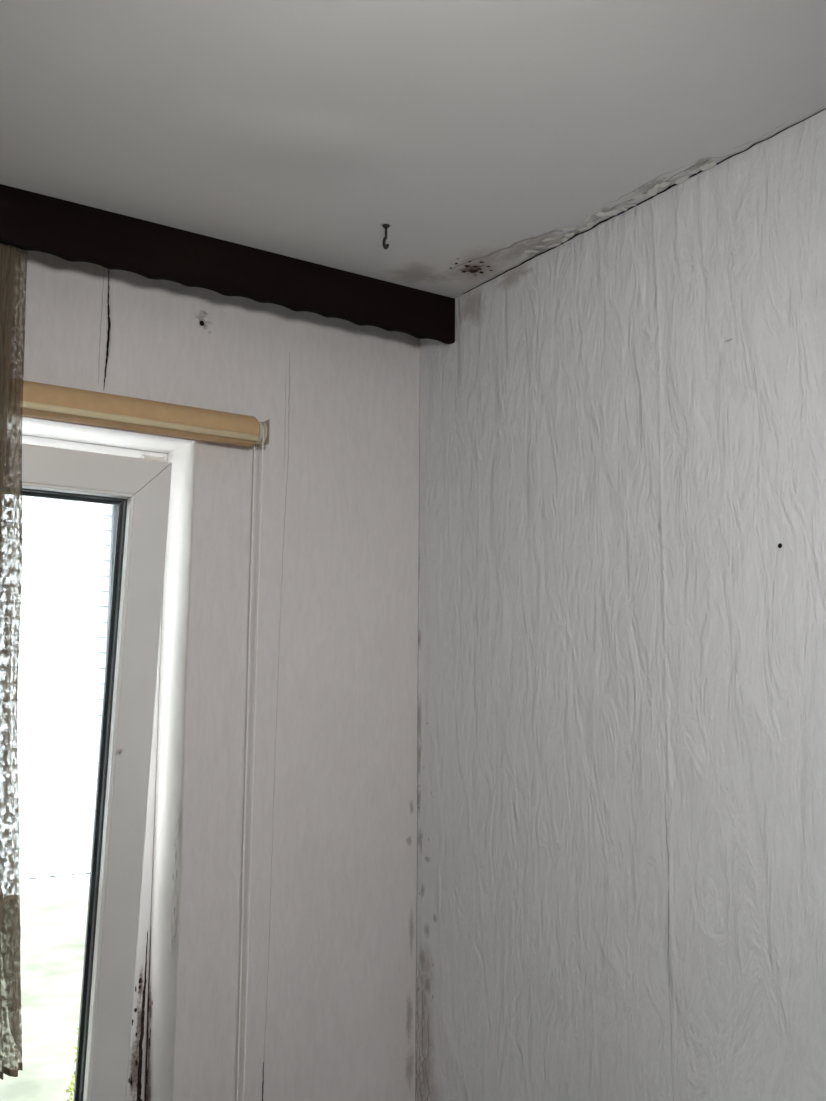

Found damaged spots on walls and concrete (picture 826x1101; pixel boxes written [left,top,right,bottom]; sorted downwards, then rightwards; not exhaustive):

damp [449,258,492,276]
crack [104,269,114,386]
damp [128,932,153,1101]